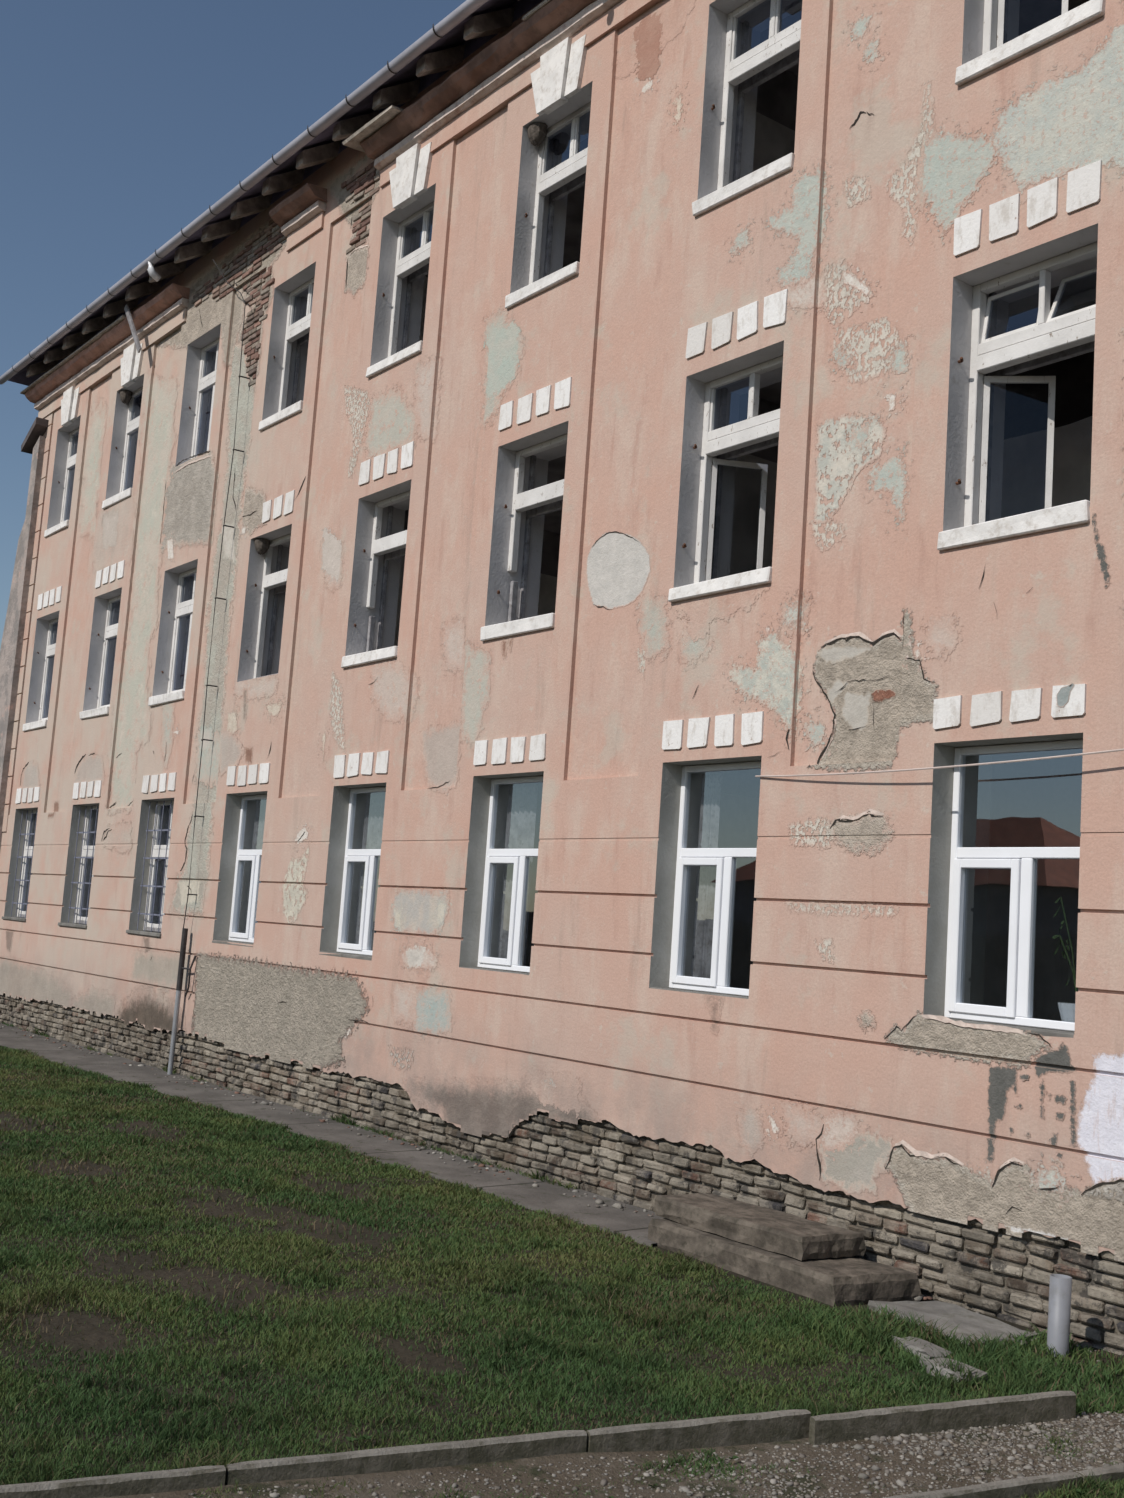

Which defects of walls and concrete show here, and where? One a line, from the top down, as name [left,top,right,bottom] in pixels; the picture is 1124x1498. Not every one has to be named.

flaking render [325,155,381,297]
peeling [724,0,1124,552]
peeling [77,218,287,920]
spalling [722,588,963,772]
spalling [788,808,896,858]
flaking render [191,884,456,1072]
spalling [776,1094,1124,1262]
spalling [856,1008,1052,1070]
water stain [986,1041,1077,1163]